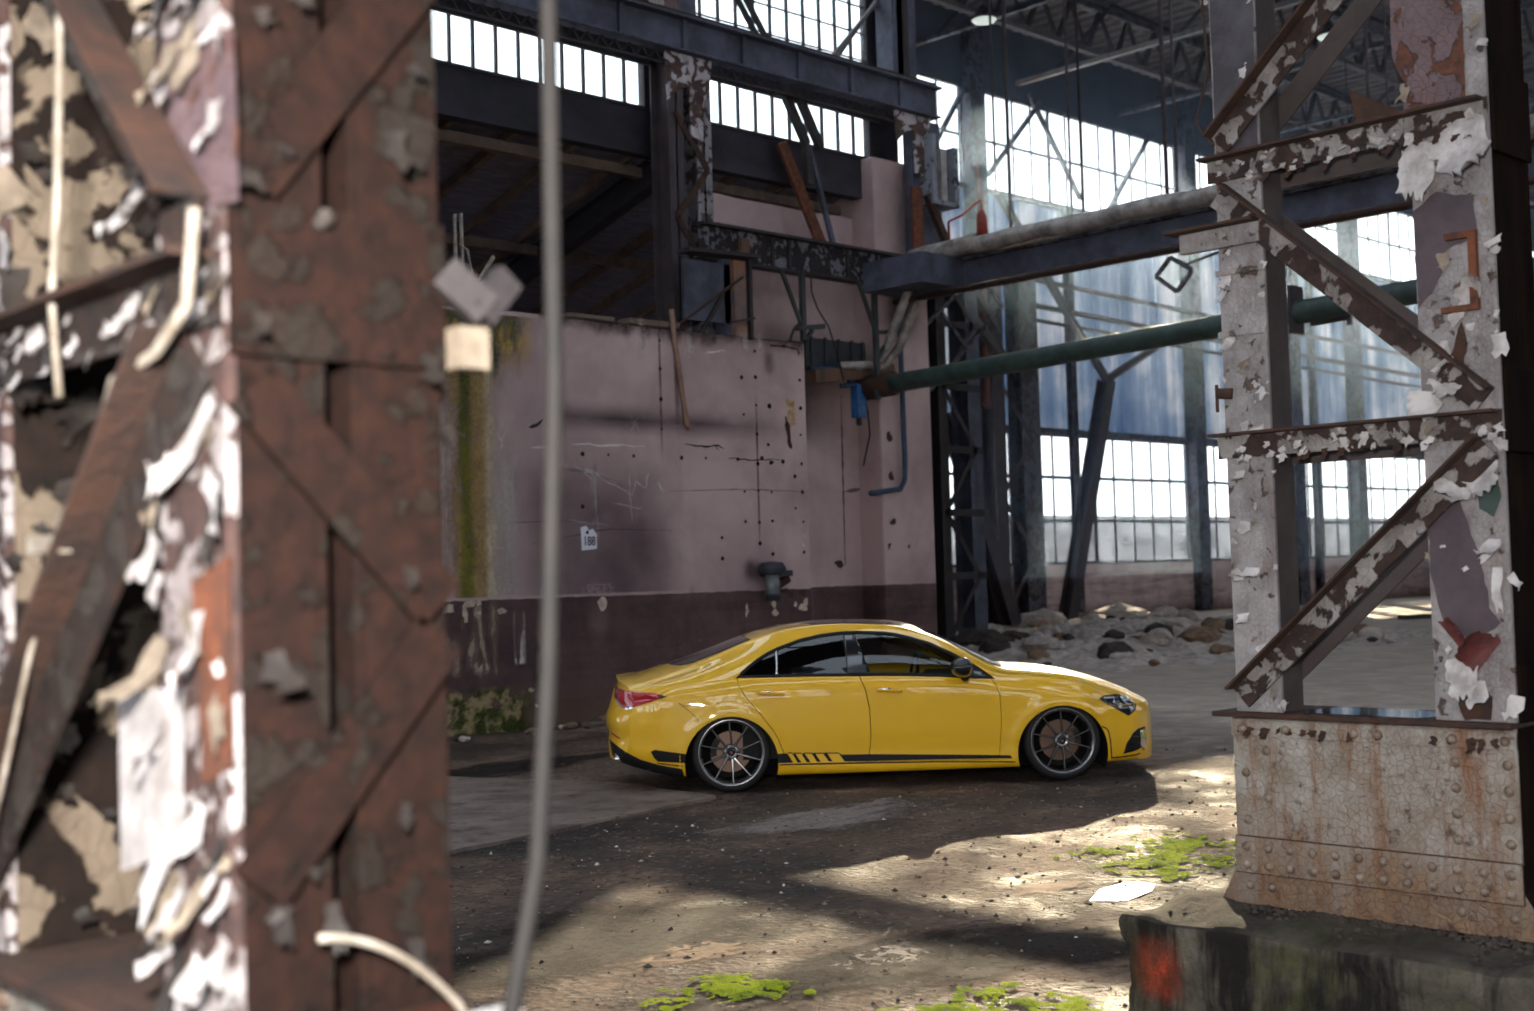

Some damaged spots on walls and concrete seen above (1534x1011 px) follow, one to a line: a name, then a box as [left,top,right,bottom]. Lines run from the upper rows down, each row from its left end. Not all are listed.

peeling [21,2,77,69]
peeling [129,0,221,117]
corrosion [1390,0,1466,110]
peeling [0,142,59,309]
peeling [95,162,169,241]
peeling [1311,107,1510,452]
peeling [0,284,160,448]
peeling [1219,337,1308,481]
peeling [125,392,223,607]
damp [441,309,526,738]
peeling [1424,422,1525,721]
peeling [89,597,238,1011]